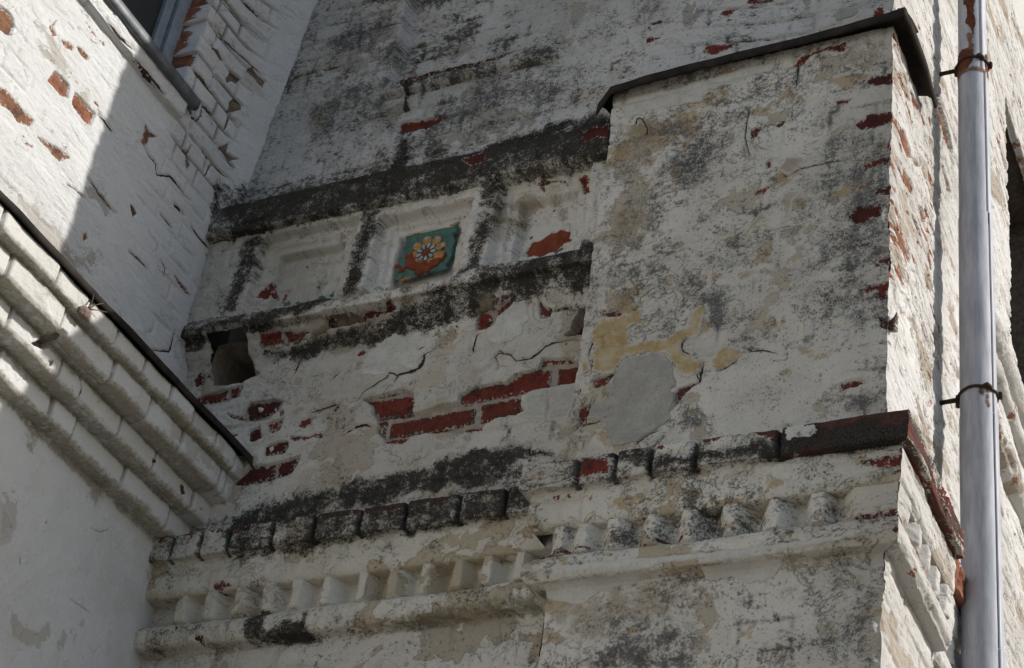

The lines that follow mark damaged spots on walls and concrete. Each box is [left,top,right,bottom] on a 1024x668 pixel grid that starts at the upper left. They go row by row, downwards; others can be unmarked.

rust [957,0,989,82]
flaking render [0,87,34,127]
flaking render [47,72,94,125]
flaking render [37,137,69,162]
flaking render [855,112,918,194]
leakage [173,43,611,365]
flaking render [527,230,572,257]
crack [311,346,432,435]
spalling [367,360,581,444]
crack [472,333,593,367]
spalling [230,401,323,486]
leakage [220,443,565,567]